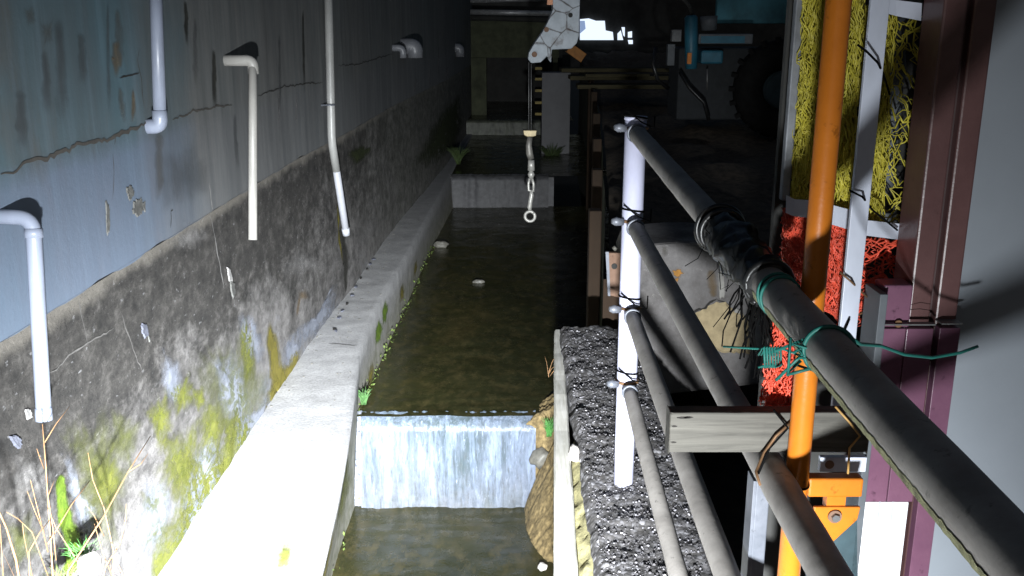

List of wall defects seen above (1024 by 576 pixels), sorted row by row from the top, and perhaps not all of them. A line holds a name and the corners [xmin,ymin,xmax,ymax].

crack [258,53,393,96]
crack [1,53,146,191]
crack [173,104,232,120]
peeling [126,186,146,217]
spalling [141,323,151,342]
leakage [164,363,179,399]
leakage [217,297,334,442]
leakage [69,474,93,522]
leakage [139,487,169,547]
leakage [184,447,219,536]